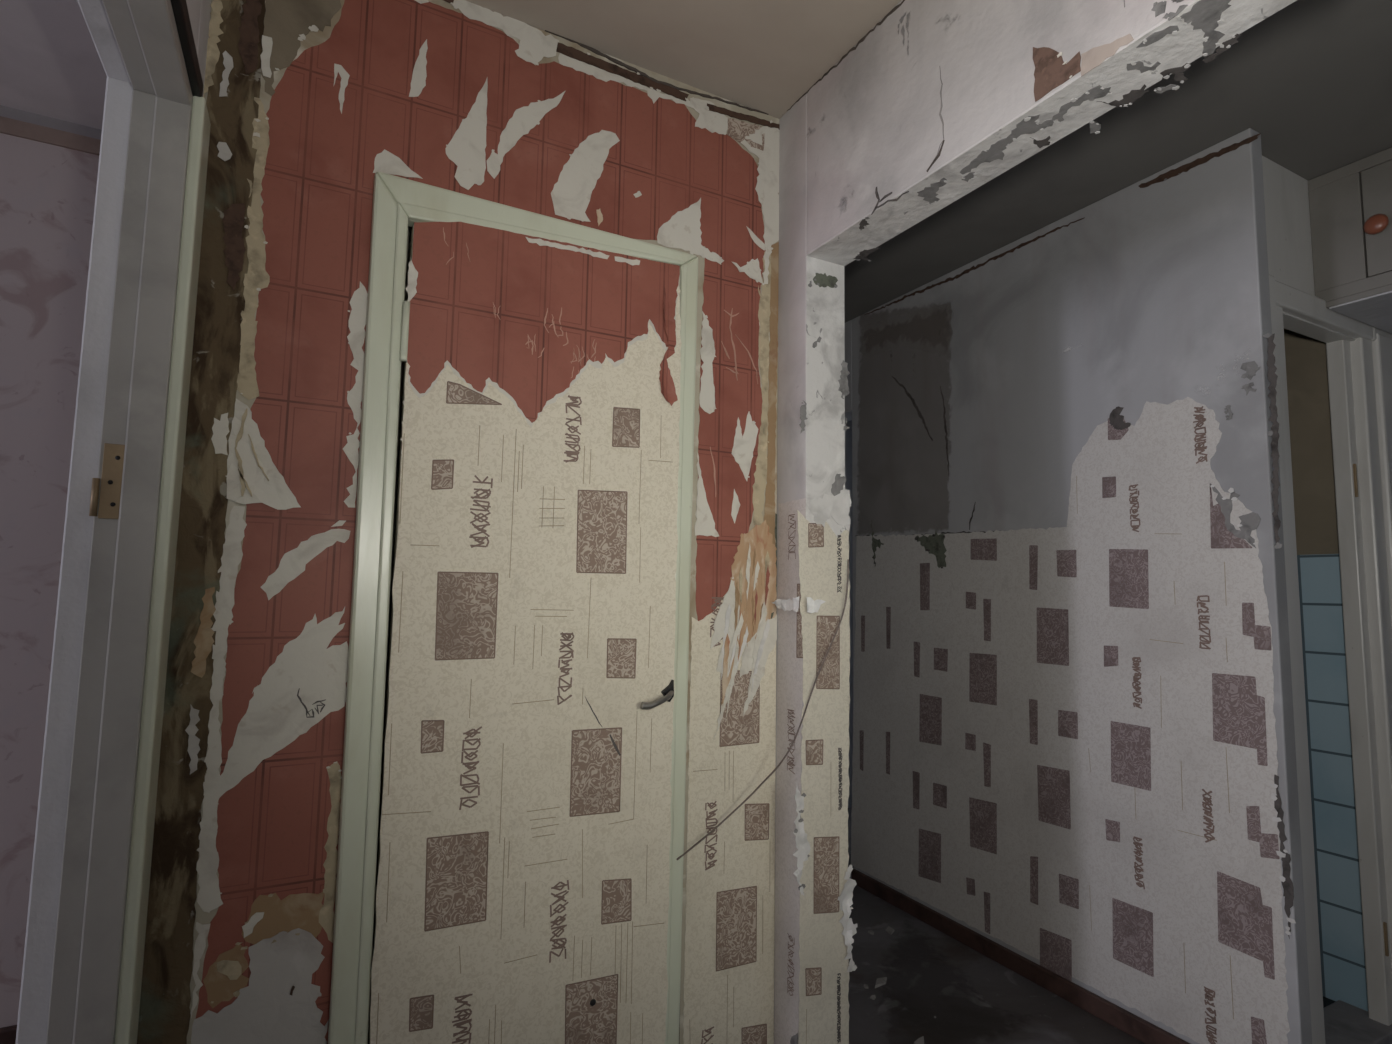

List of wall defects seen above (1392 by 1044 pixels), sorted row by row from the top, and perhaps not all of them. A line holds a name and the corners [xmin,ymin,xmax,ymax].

peeling [450,0,728,135]
spalling [917,0,1241,205]
peeling [739,226,773,298]
peeling [137,0,341,1044]
spalling [1240,333,1282,549]